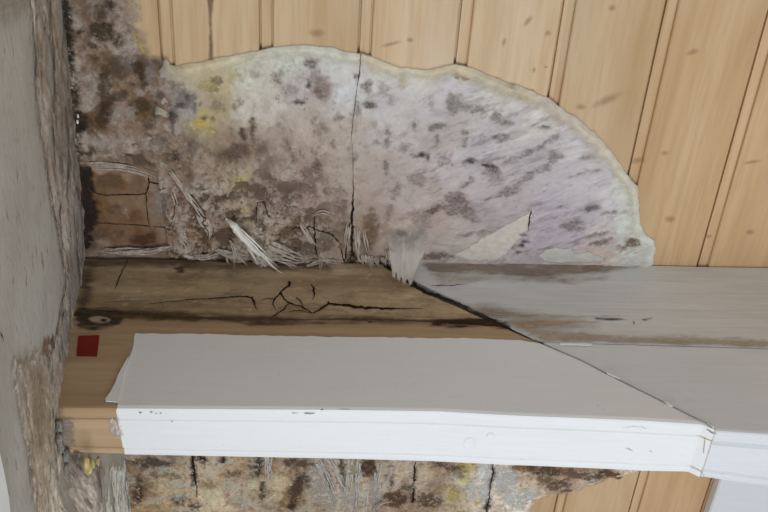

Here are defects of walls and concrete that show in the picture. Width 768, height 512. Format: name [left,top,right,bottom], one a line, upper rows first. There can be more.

crack [351,54,361,152]
damp [61,0,656,330]
crack [291,184,354,263]
crack [147,281,424,323]
damp [432,307,768,346]
crack [190,456,198,497]
damp [124,454,638,512]
crack [486,464,494,512]